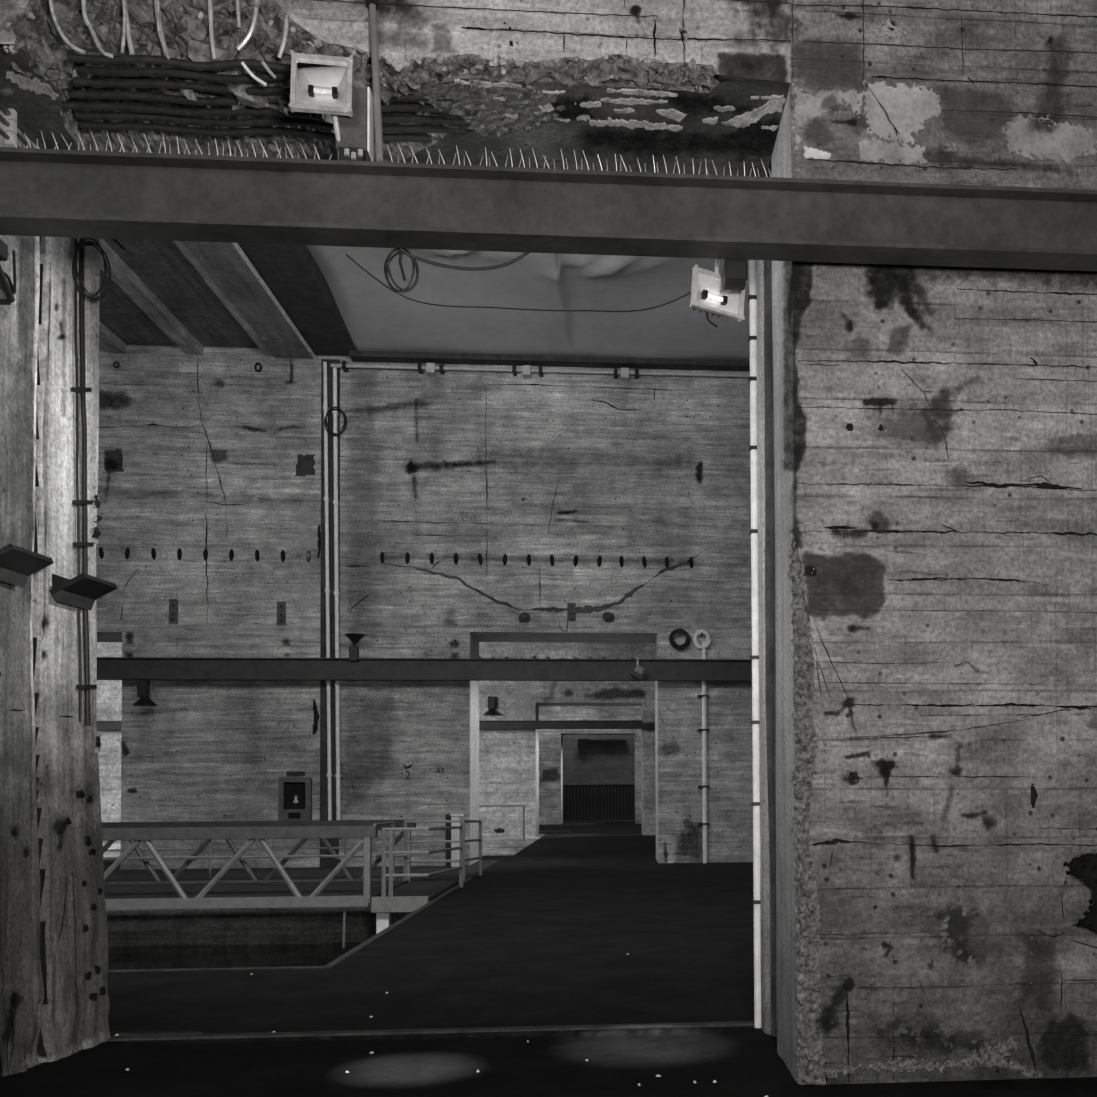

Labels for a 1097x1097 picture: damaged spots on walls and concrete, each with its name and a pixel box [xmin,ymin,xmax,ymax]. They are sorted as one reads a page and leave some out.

spalling [0,0,720,162]
peeling [702,78,941,166]
peeling [1000,114,1097,165]
water stain [866,264,930,344]
water stain [928,266,1097,284]
crack [347,384,700,631]
water stain [783,261,888,632]
water stain [922,389,952,442]
crack [798,475,1096,491]
crack [799,357,1097,459]
crack [811,609,1097,739]
spalling [787,529,1097,1085]